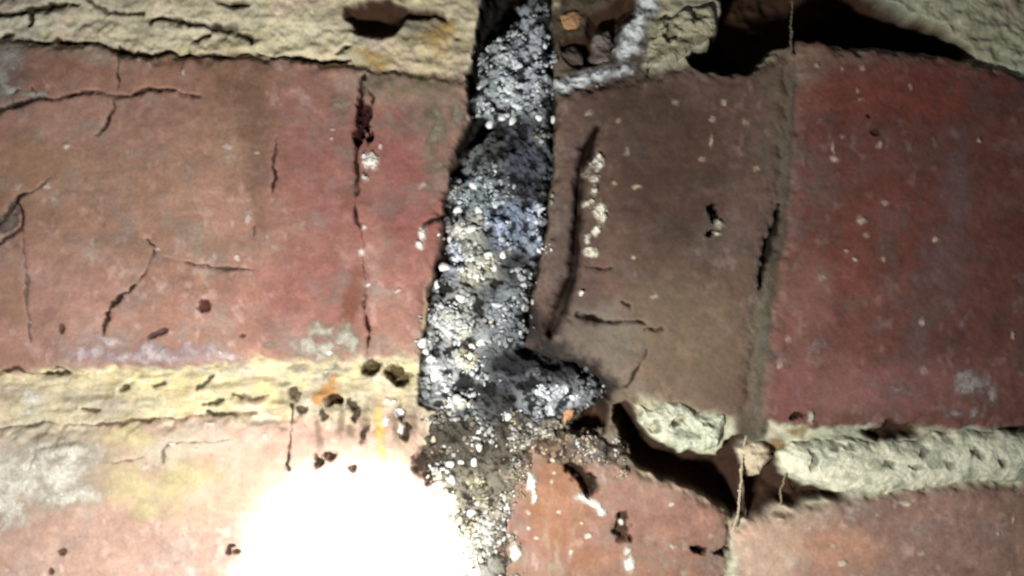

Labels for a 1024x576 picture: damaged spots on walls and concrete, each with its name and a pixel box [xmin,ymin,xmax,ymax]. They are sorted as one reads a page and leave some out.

crack [0,0,375,227]
crack [419,0,653,374]
crack [0,183,44,340]
crack [103,239,155,334]
crack [363,302,371,346]
spalling [412,447,435,486]
spalling [565,462,596,494]